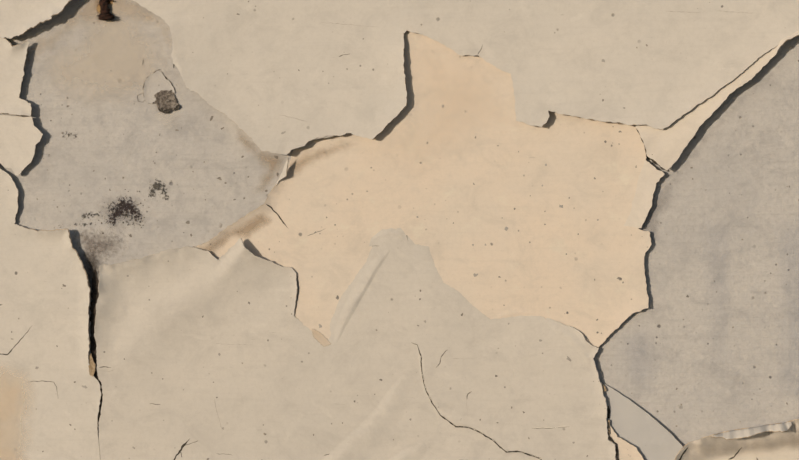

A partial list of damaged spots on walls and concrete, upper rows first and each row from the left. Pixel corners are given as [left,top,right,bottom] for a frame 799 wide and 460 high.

damp [75,179,178,234]
peeling [133,0,799,348]
crack [90,269,103,433]
peeling [0,168,799,460]
crack [411,342,541,460]